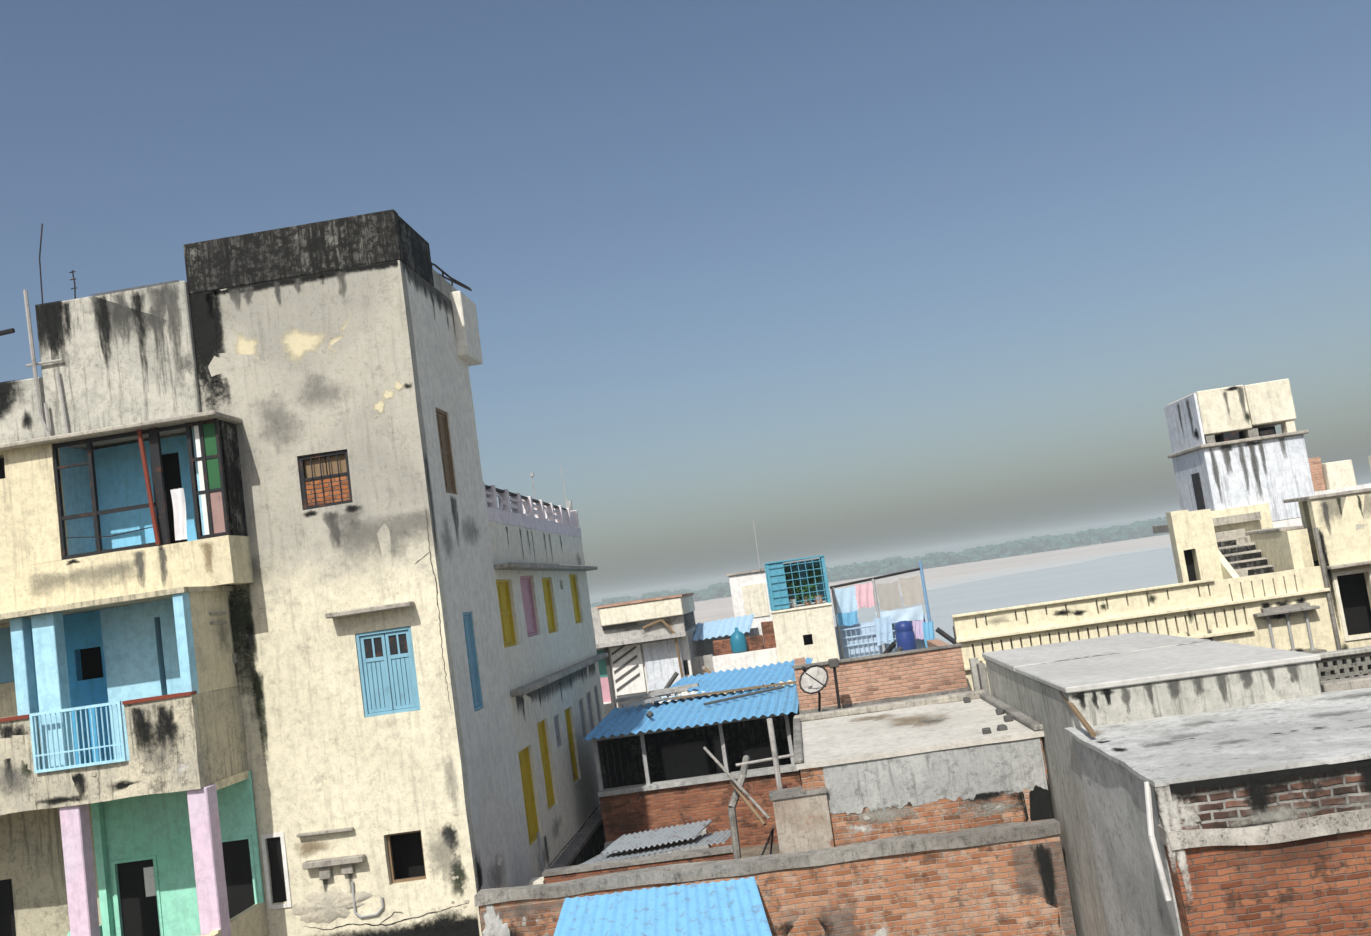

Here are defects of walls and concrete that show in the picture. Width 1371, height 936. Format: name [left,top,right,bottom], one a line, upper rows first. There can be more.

water stain [35,300,71,360]
peeling [236,335,260,361]
water stain [92,260,455,405]
peeling [282,320,349,360]
peeling [373,381,411,418]
water stain [226,584,267,749]
water stain [131,706,177,753]
water stain [1157,759,1371,890]
water stain [1034,844,1060,926]